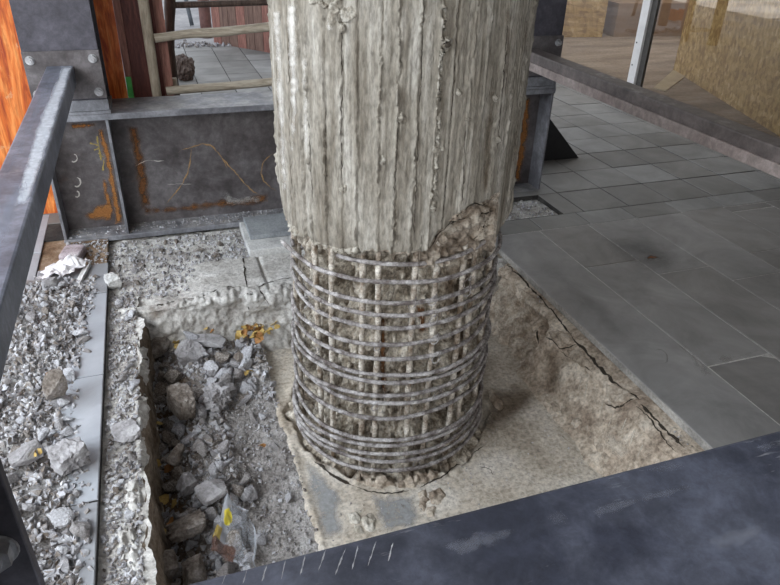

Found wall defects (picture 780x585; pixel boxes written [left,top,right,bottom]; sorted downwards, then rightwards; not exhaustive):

corrosion [88,131,121,222]
corrosion [130,128,265,213]
spalling [287,222,377,255]
spalling [435,204,495,248]
crack [507,264,684,452]
spalling [332,460,456,489]